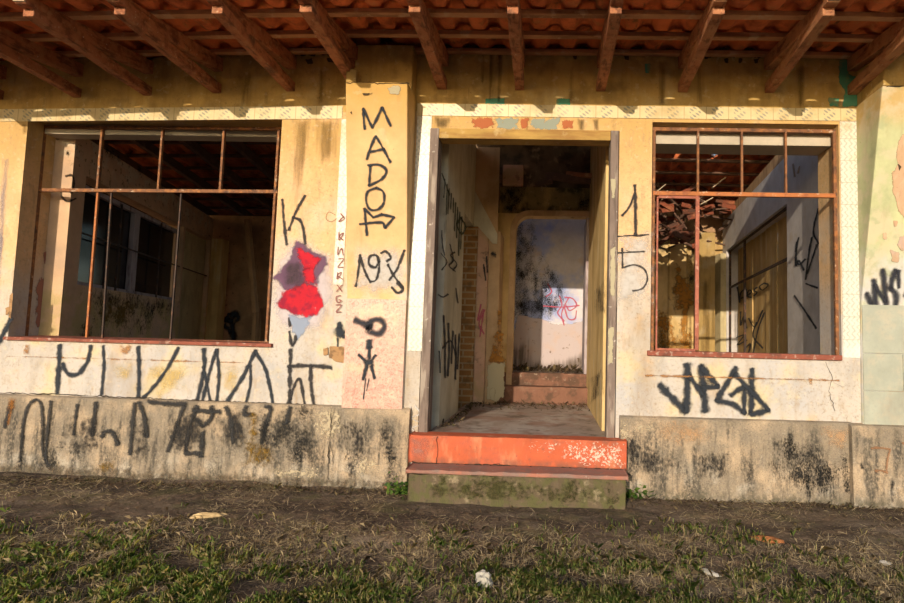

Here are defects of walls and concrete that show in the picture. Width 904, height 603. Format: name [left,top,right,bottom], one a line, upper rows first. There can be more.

peeling [496,117,518,129]
peeling [531,118,560,130]
peeling [883,134,904,240]
peeling [890,236,904,262]
leakage [41,418,98,469]
leakage [168,417,205,450]
leakage [216,405,315,468]
leakage [340,422,366,475]
leakage [628,438,679,477]
leakage [698,454,725,478]
leakage [771,434,850,497]